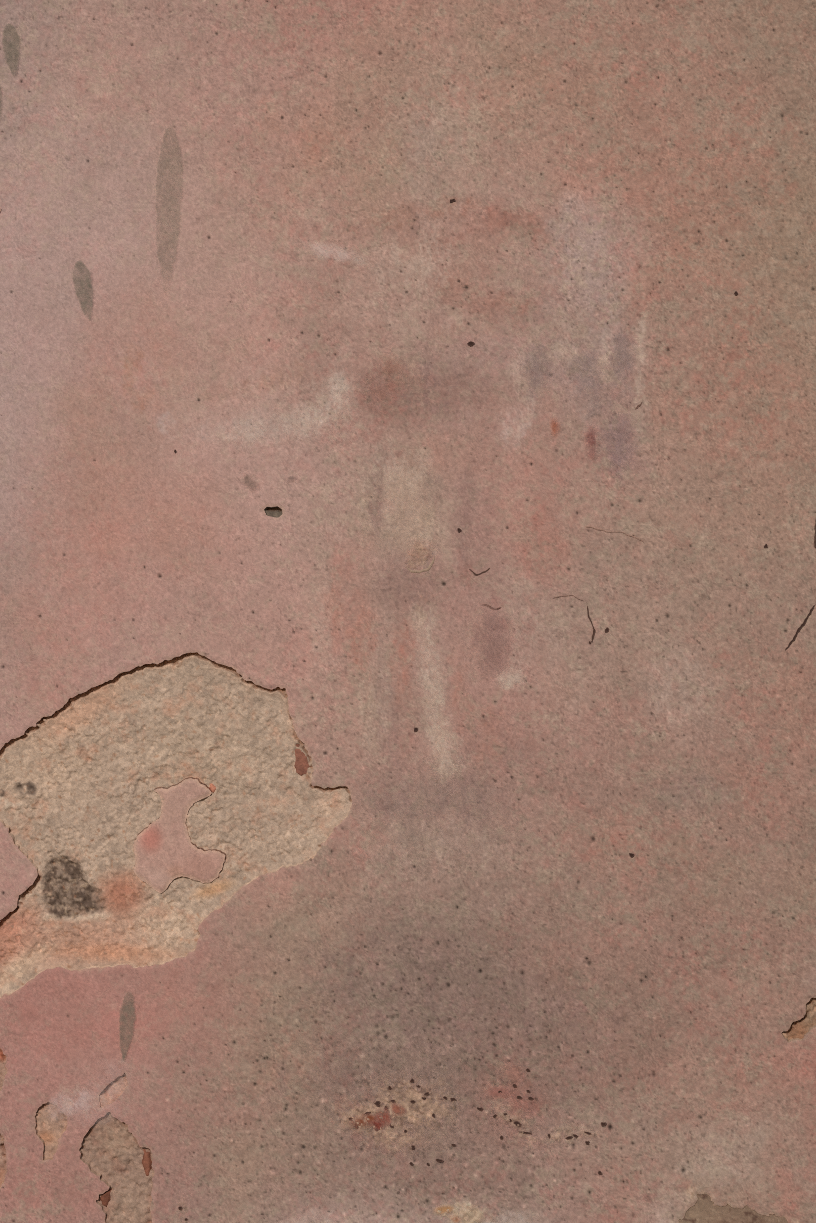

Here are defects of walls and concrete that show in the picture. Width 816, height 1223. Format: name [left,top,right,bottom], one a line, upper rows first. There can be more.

crack [785,587,816,650]
flaking render [0,652,352,998]
flaking render [781,997,816,1043]
flaking render [35,1102,68,1161]
flaking render [79,1073,154,1223]
peeling [679,1194,788,1223]